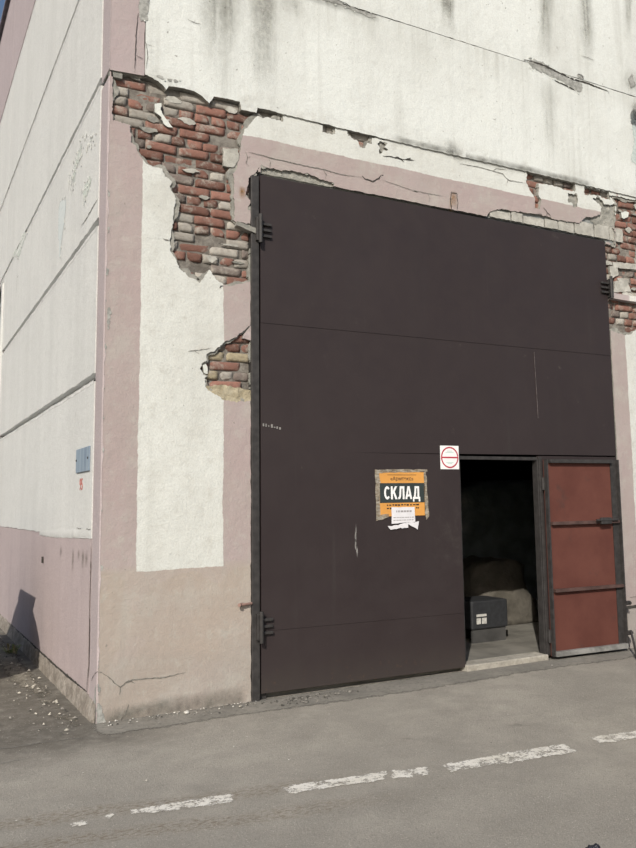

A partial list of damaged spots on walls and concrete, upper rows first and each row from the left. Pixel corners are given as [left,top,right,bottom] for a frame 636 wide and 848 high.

peeling [138,0,150,21]
peeling [529,56,584,94]
flaking render [112,73,283,286]
flaking render [253,165,334,187]
flaking render [347,131,387,154]
flaking render [486,172,636,335]
flaking render [200,326,251,402]
crack [86,649,185,719]